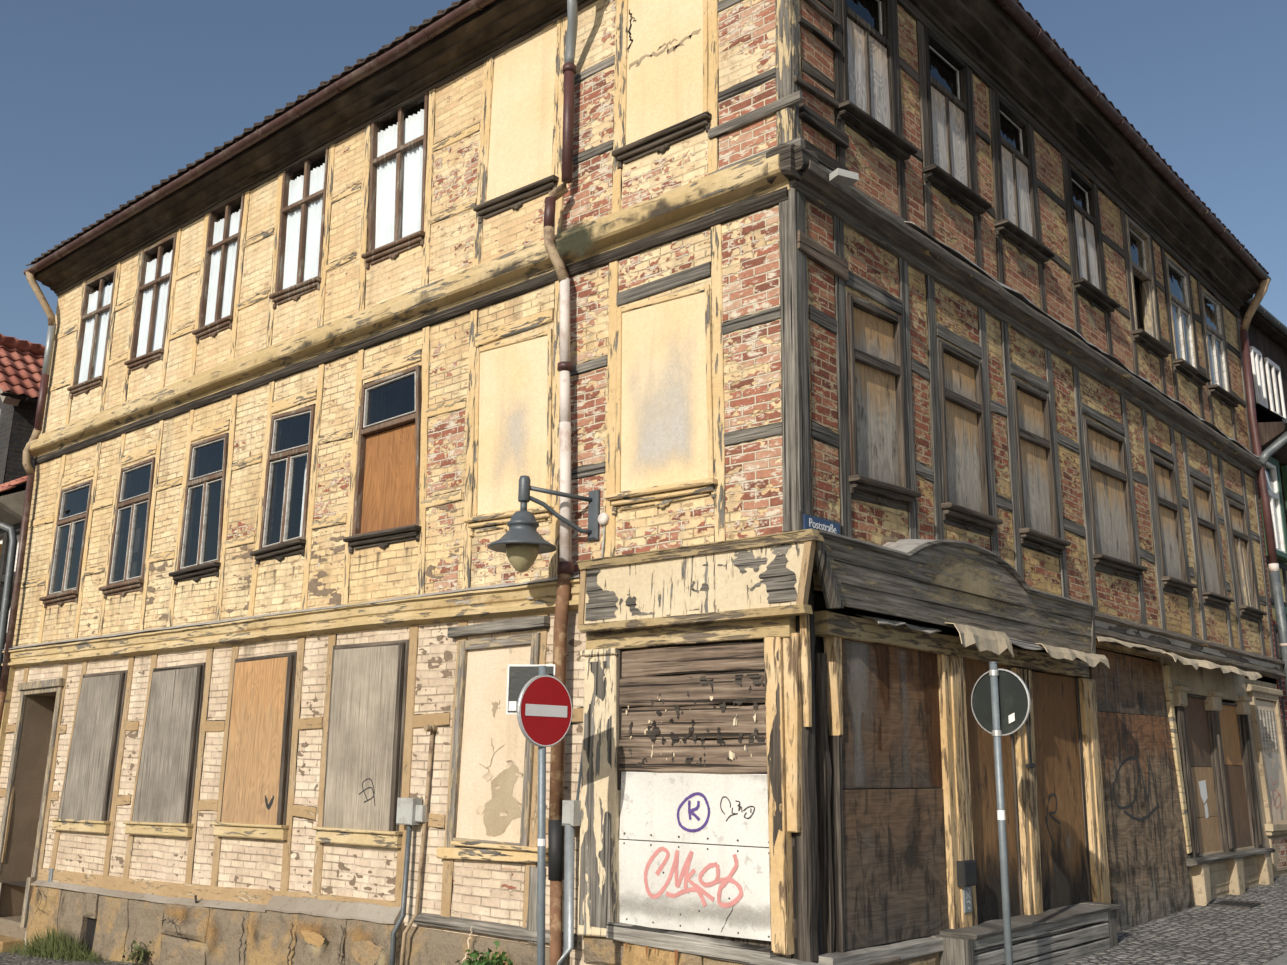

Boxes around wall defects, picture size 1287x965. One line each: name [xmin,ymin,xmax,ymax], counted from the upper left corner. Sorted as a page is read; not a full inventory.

crack [627,10,701,69]
peeling [429,118,544,271]
water stain [480,262,520,282]
peeling [416,205,797,621]
peeling [308,447,350,605]
flaking render [476,760,522,837]
peeling [546,635,782,928]